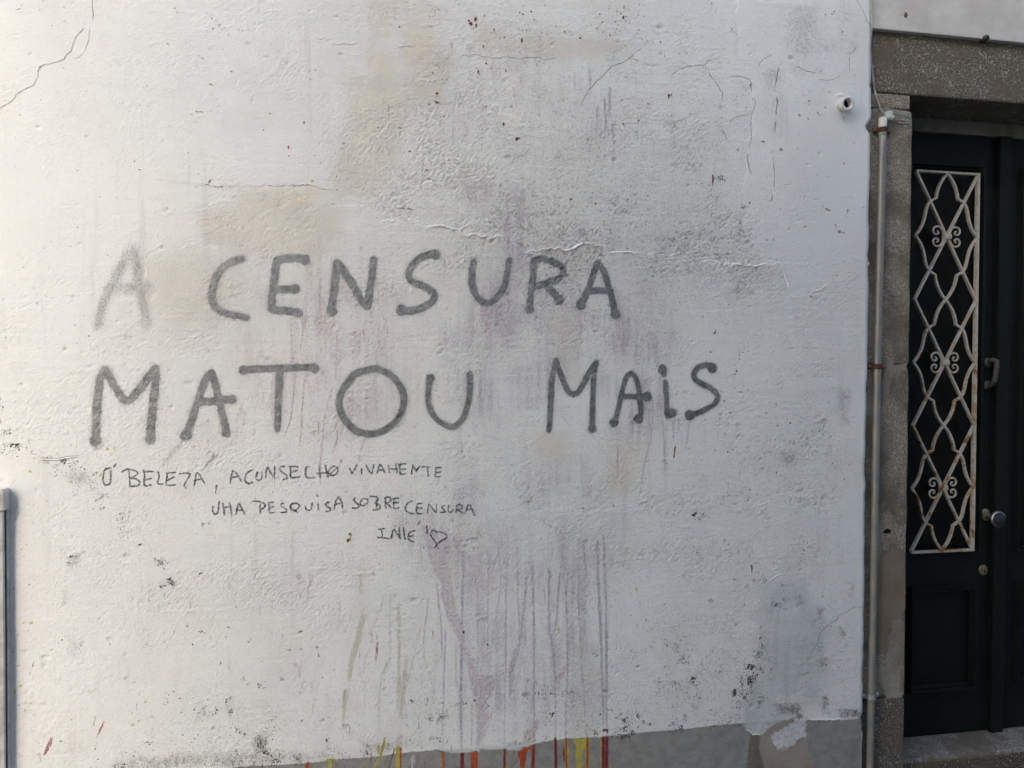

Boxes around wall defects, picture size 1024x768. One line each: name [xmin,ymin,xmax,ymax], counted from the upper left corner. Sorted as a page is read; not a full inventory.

crack [1,0,94,108]
crack [583,42,856,201]
peeling [746,710,848,768]